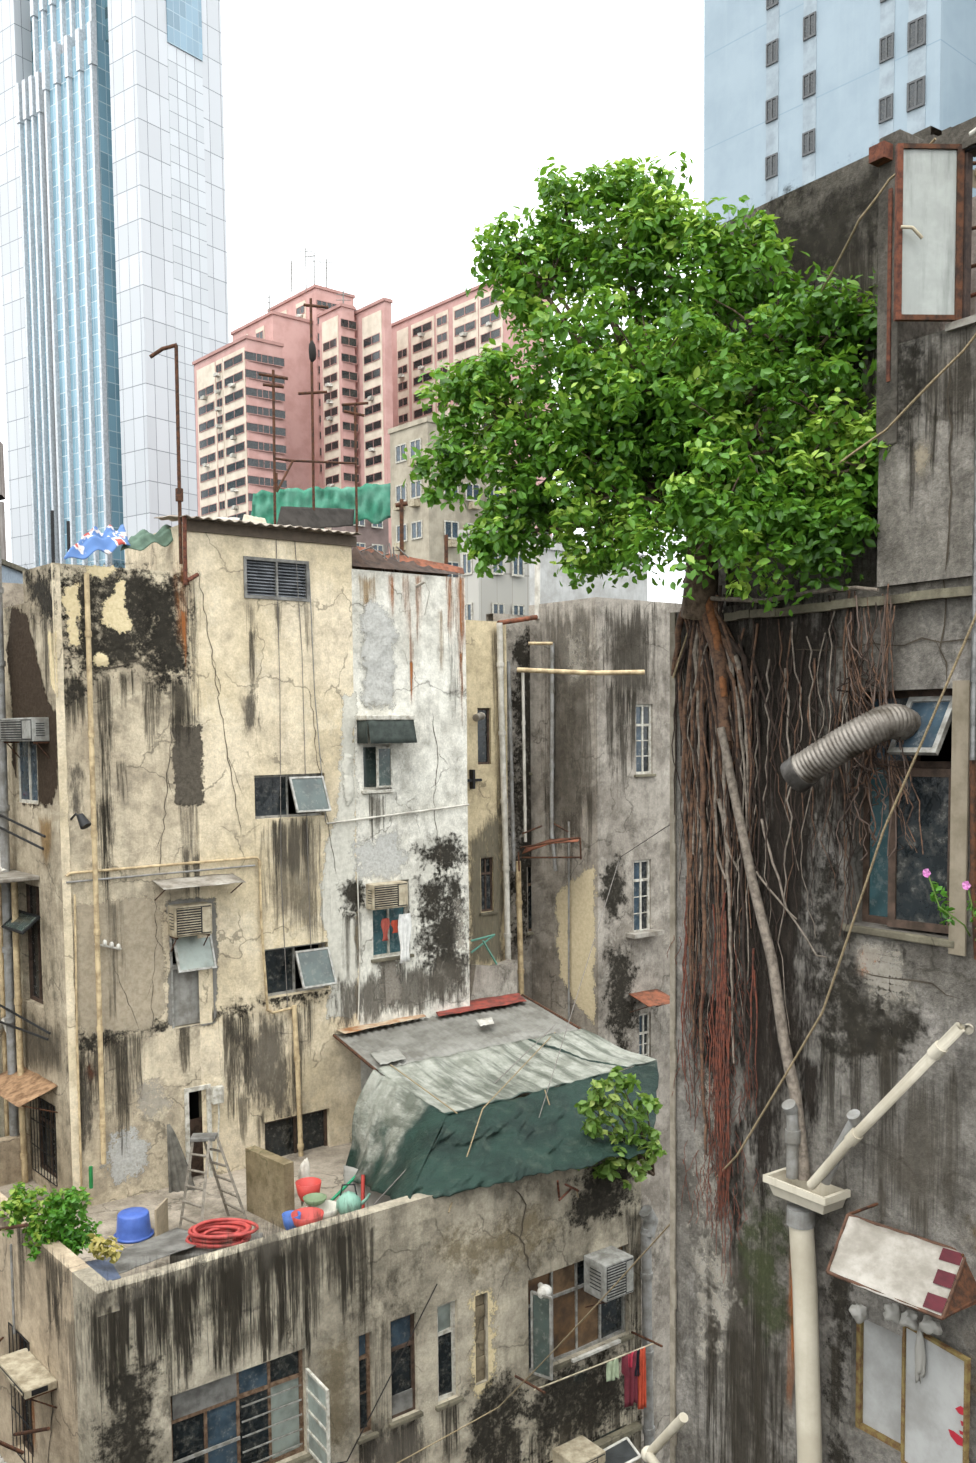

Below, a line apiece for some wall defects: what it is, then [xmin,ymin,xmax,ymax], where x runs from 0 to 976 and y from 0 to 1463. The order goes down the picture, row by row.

leakage [897,328,976,502]
corrosion [364,576,420,697]
corrosion [440,576,464,699]
leakage [24,562,657,1152]
leakage [686,577,958,1463]
leakage [0,1206,384,1463]
leakage [359,1419,426,1463]
leakage [438,1161,643,1463]